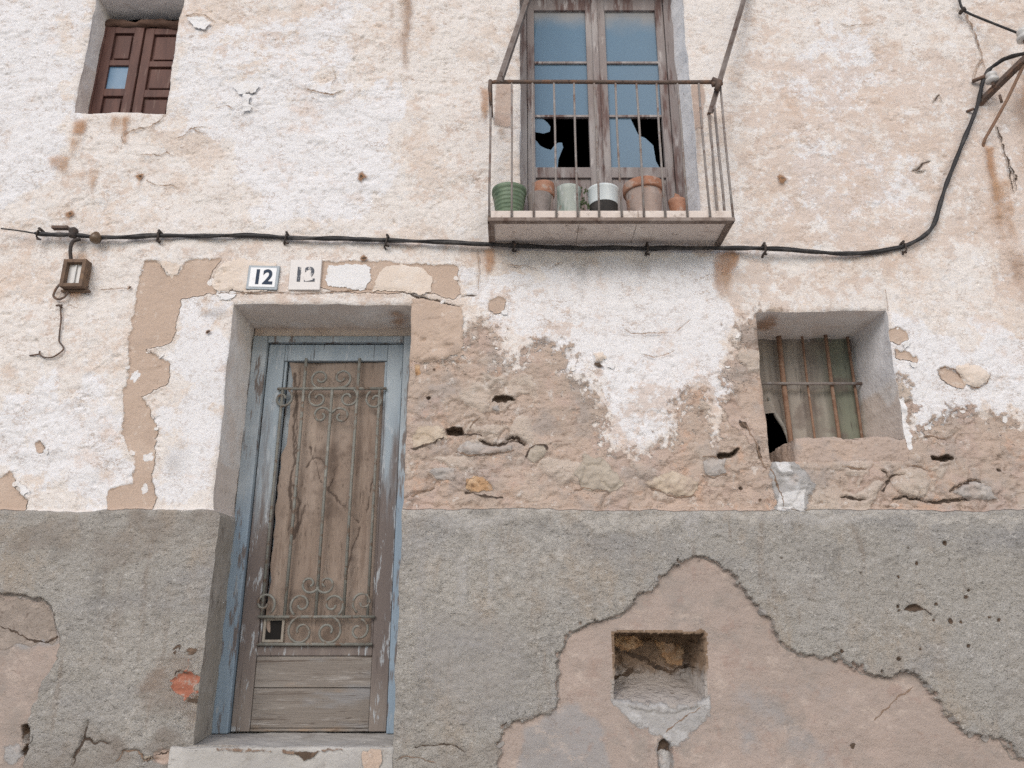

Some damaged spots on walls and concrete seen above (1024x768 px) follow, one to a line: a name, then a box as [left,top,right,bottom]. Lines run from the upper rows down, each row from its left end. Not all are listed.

crack [997,127,1018,193]
flaking render [303,258,461,304]
flaking render [107,257,277,510]
flaking render [402,296,1024,512]
spalling [0,592,60,768]
crack [73,724,159,765]
flaking render [170,645,200,703]
spalling [497,555,1024,768]